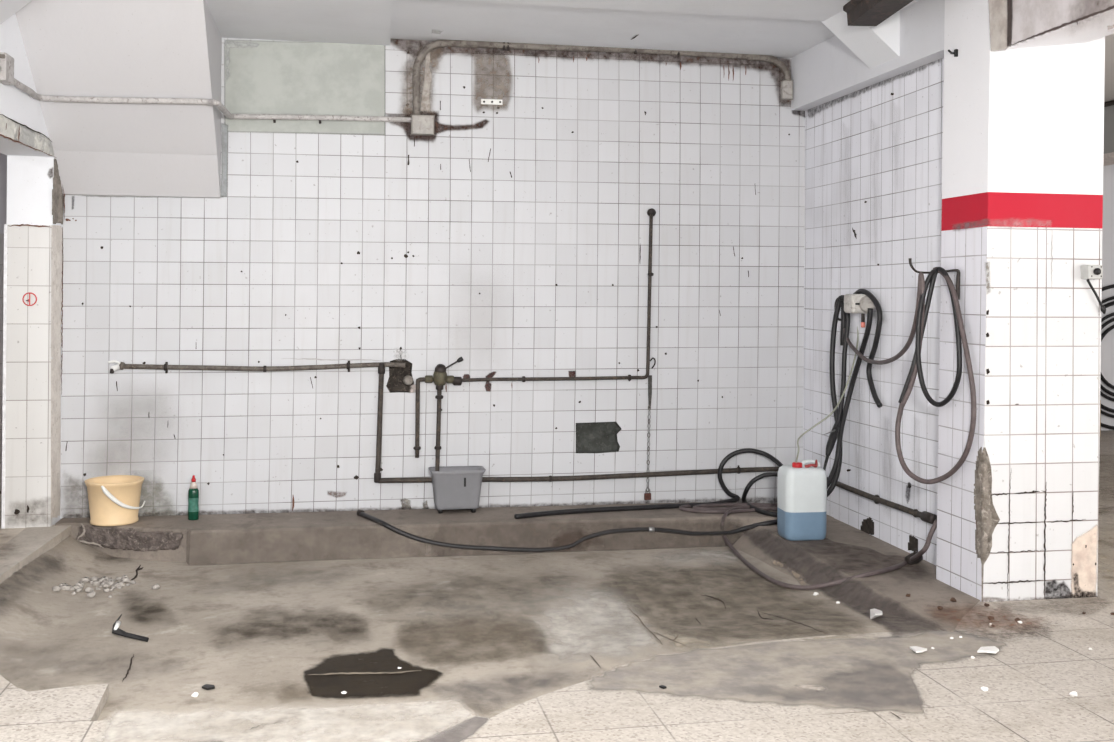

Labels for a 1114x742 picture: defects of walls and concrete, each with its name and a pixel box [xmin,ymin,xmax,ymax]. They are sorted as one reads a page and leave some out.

flaking render [989,0,1114,51]
crack [1011,6,1114,46]
damp [475,55,511,110]
spalling [0,114,65,224]
spalling [974,447,993,559]
rust [931,606,1036,630]